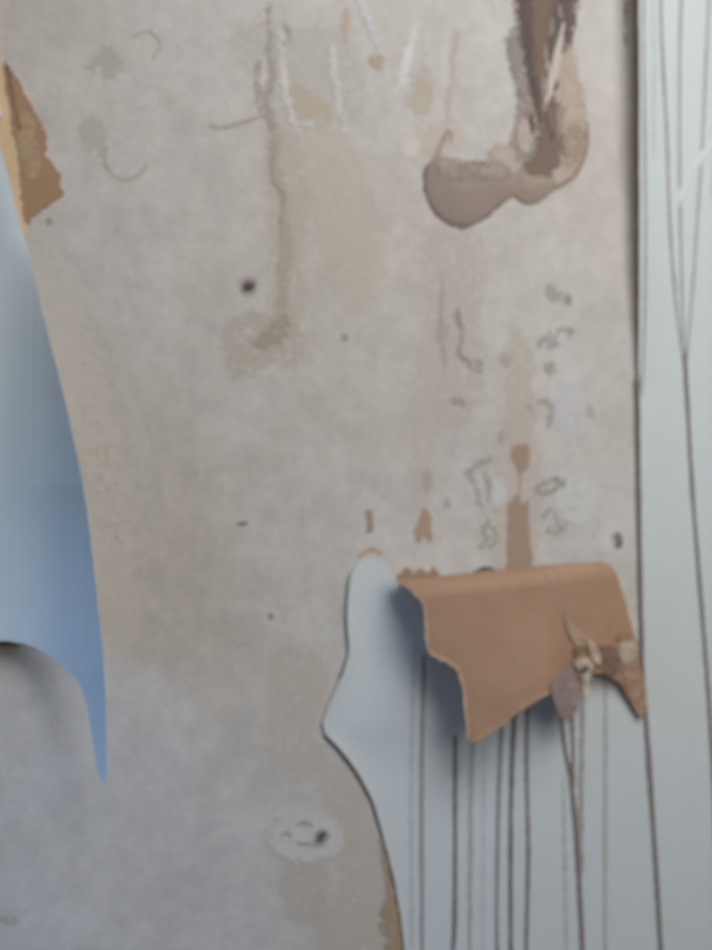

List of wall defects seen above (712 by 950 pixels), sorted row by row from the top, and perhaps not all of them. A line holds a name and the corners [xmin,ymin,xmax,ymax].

leakage [485,0,590,204]
leakage [274,762,393,950]